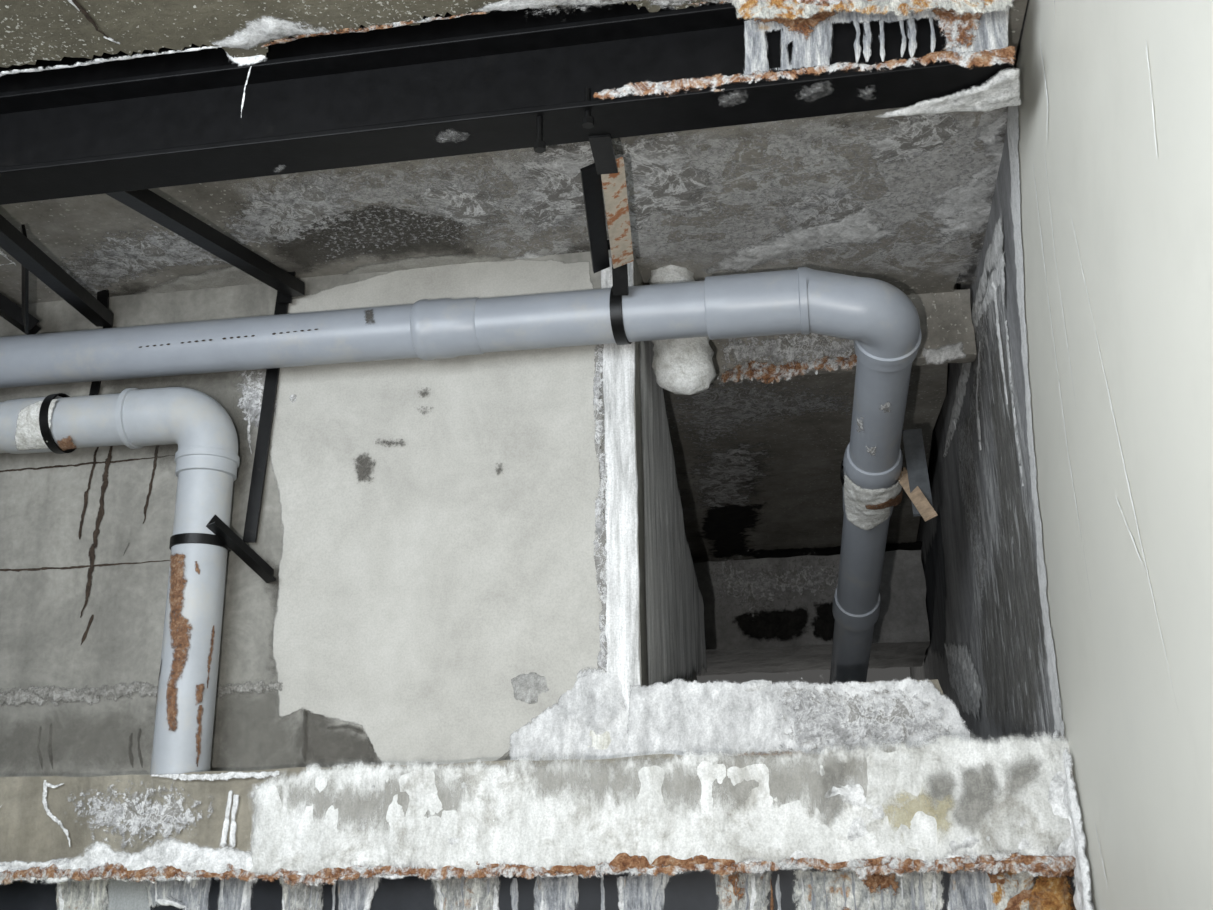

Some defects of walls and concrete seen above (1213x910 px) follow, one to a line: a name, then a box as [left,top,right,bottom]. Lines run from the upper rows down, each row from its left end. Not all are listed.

crack [68,0,120,44]
corrosion [754,9,838,39]
water stain [60,224,229,298]
water stain [224,141,595,271]
water stain [601,190,613,289]
corrosion [721,353,857,384]
water stain [612,69,1064,739]
corrosion [154,554,200,731]
water stain [0,341,1092,910]
corrosion [196,625,215,767]
corrosion [861,872,899,895]
peeling [988,870,1034,910]